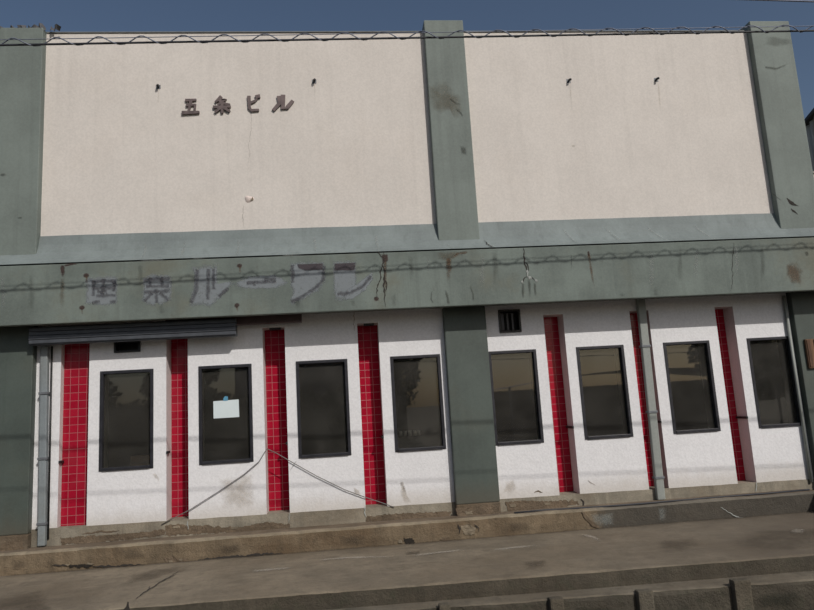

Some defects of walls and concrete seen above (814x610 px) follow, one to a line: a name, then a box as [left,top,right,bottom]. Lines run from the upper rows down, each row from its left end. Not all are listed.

crack [374,252,388,306]
crack [521,248,538,283]
spalling [60,522,290,545]